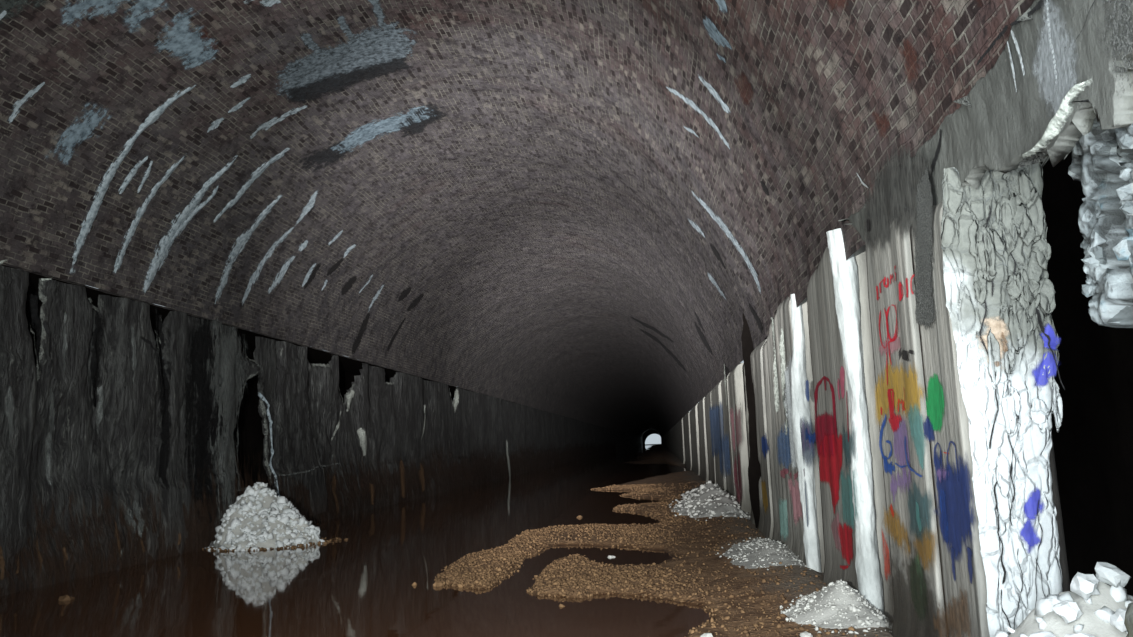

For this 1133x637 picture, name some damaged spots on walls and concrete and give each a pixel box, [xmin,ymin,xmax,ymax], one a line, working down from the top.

damp [70,85,196,273]
damp [62,0,217,69]
damp [143,155,238,293]
damp [215,195,282,303]
damp [242,191,318,306]
damp [250,0,416,139]
damp [667,87,730,149]
damp [692,192,761,292]
crack [979,205,1065,390]
spalling [1068,117,1133,328]
spalling [1098,0,1133,92]
crack [989,389,1046,635]